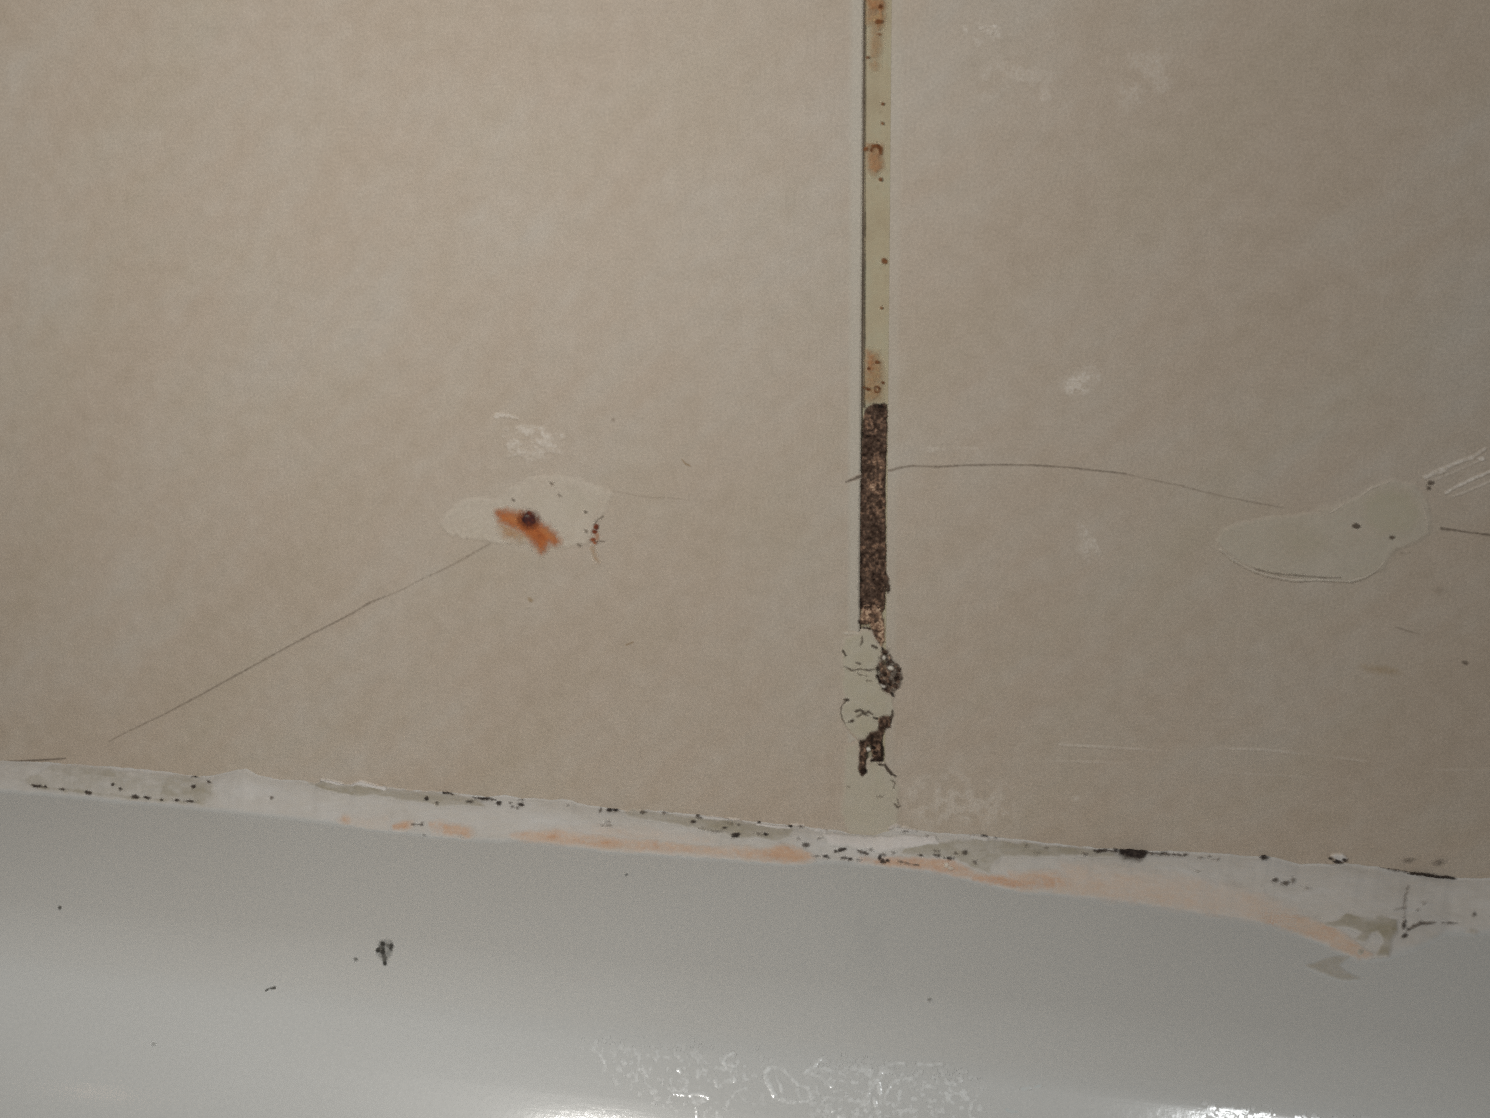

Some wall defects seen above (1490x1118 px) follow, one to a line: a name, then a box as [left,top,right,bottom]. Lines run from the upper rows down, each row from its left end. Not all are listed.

rust [864,144,882,181]
crack [844,462,1285,509]
rust [496,510,558,553]
crack [1439,526,1490,537]
crack [108,543,493,743]
leakage [335,792,524,841]
leakage [507,808,1375,965]
leakage [1387,859,1455,879]
leakage [1401,893,1480,938]
peeling [1303,912,1400,983]